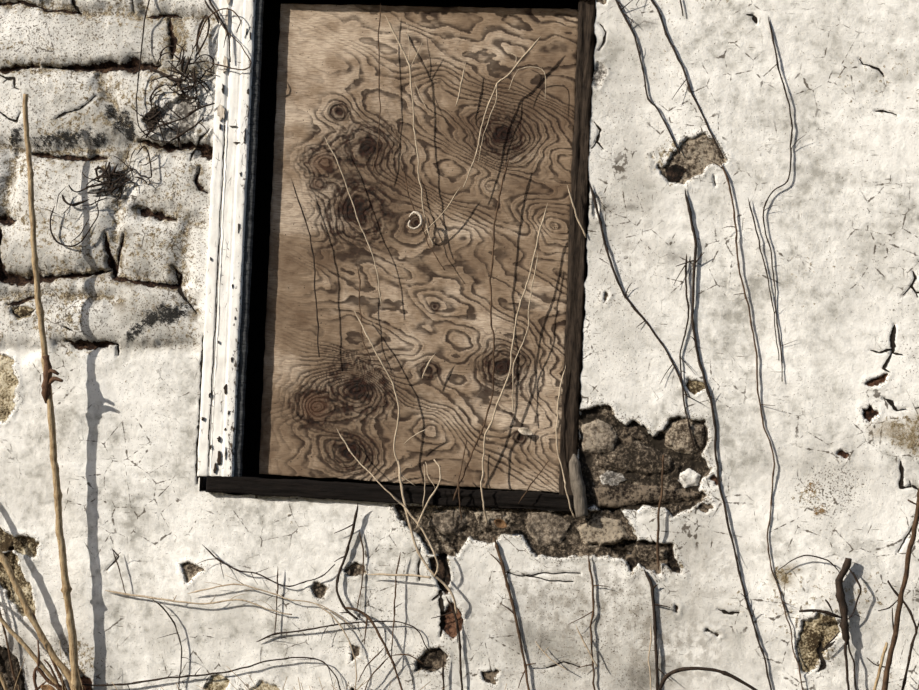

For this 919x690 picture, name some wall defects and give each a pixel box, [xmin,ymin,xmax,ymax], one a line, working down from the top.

flaking render [142,96,197,140]
flaking render [658,134,727,184]
flaking render [11,306,34,320]
flaking render [0,354,18,421]
flaking render [395,405,718,638]
flaking render [0,527,39,616]